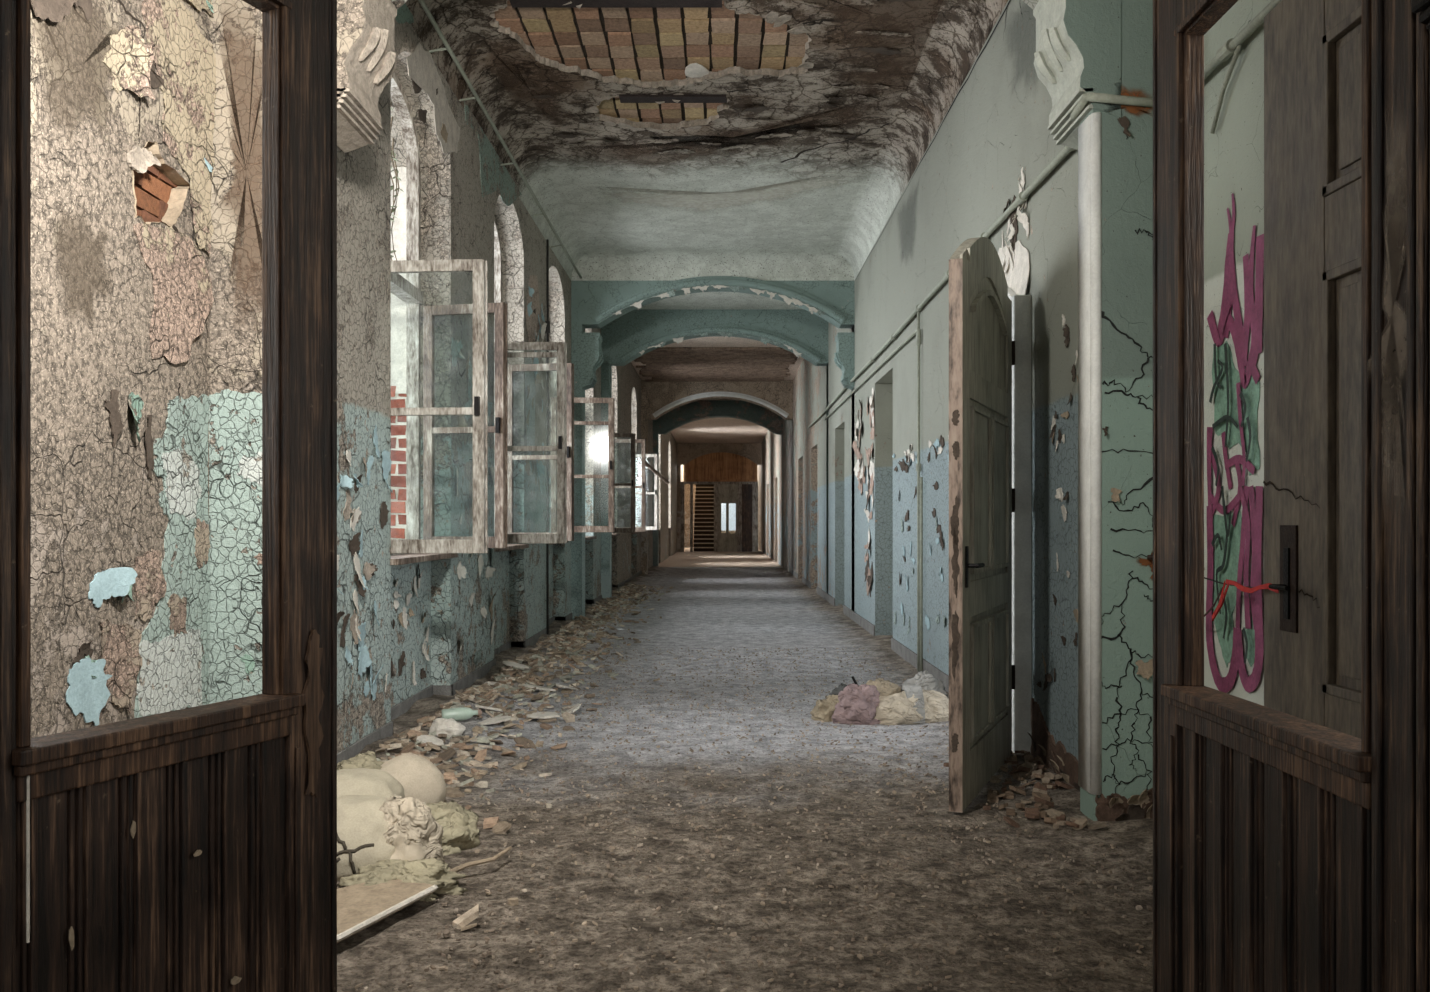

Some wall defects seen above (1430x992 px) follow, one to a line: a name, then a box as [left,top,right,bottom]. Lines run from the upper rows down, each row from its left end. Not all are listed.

peeling [31,0,93,22]
flaking render [127,0,216,364]
spalling [489,0,922,154]
peeling [66,389,262,726]
peeling [337,425,430,701]
peeling [457,340,495,464]
peeling [456,553,496,645]
peeling [852,388,875,597]
spalling [892,258,963,813]
crack [1101,449,1153,793]